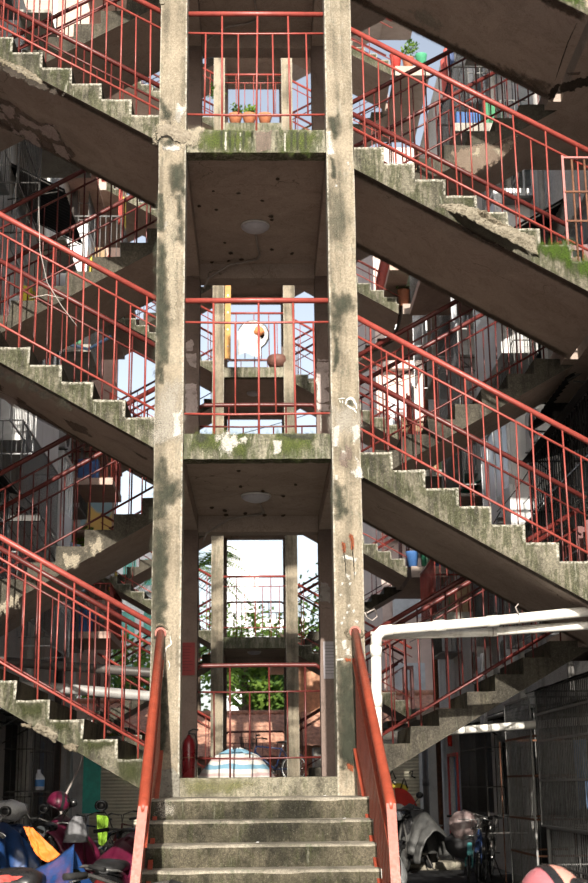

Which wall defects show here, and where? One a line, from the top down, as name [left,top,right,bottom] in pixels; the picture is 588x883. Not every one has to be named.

peeling [0,98,75,162]
water stain [42,82,174,146]
water stain [329,116,338,139]
water stain [355,171,588,297]
spalling [439,203,539,258]
water stain [52,153,185,383]
water stain [356,243,566,356]
peeling [316,359,329,430]
peeling [216,432,247,453]
peeling [333,426,346,455]